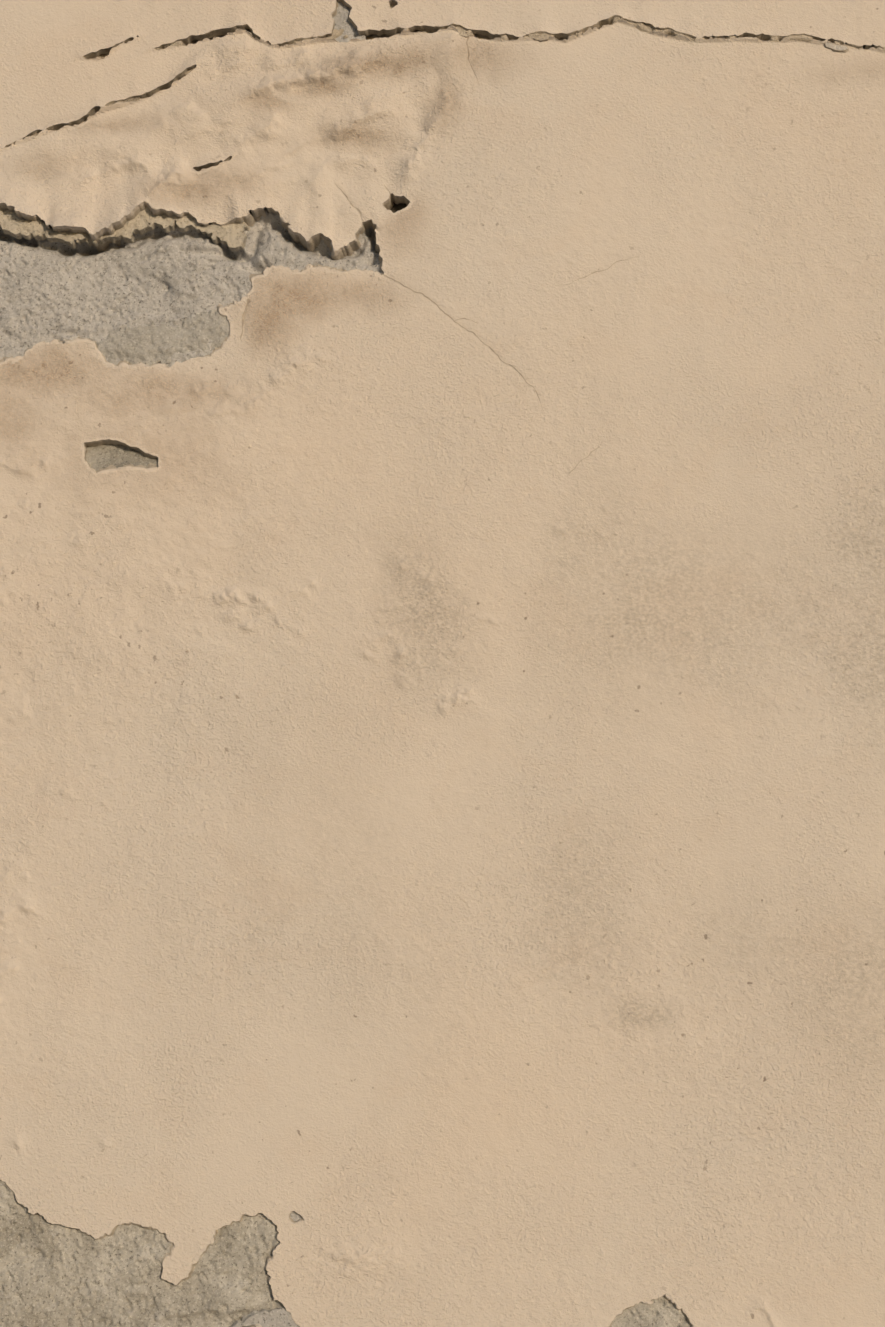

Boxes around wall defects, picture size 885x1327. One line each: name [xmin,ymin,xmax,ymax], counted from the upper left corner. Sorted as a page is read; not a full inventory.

crack [5,15,885,148]
spalling [0,0,465,368]
spalling [83,439,159,473]
spalling [0,1180,305,1327]
spalling [609,1294,694,1327]